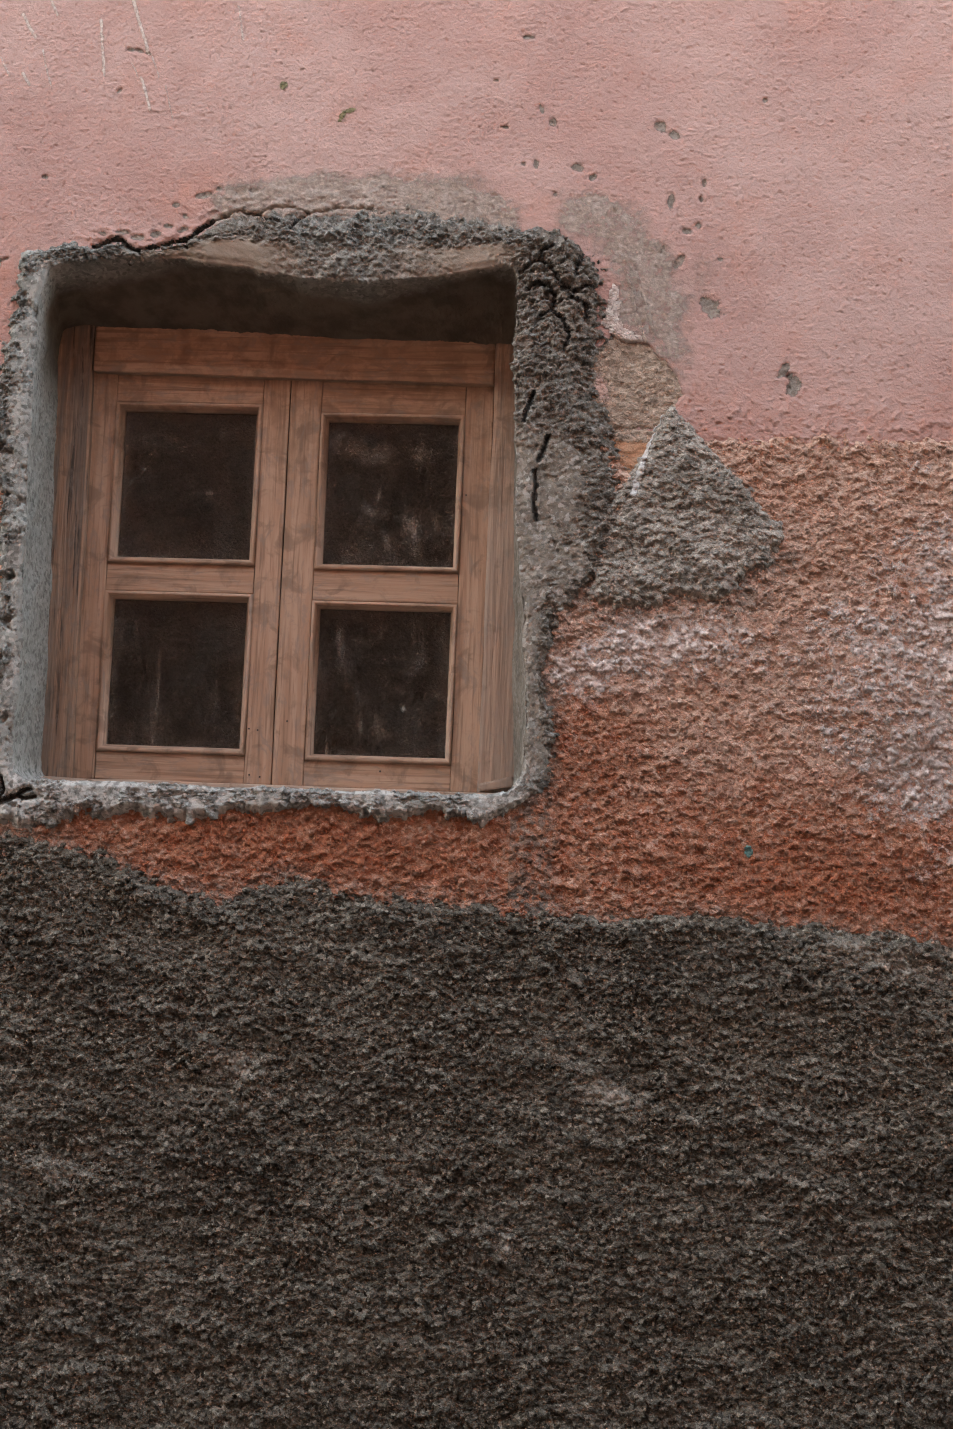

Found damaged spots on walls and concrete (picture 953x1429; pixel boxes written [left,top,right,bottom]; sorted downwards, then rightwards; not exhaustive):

crack [92,207,355,266]
peeling [586,283,785,611]